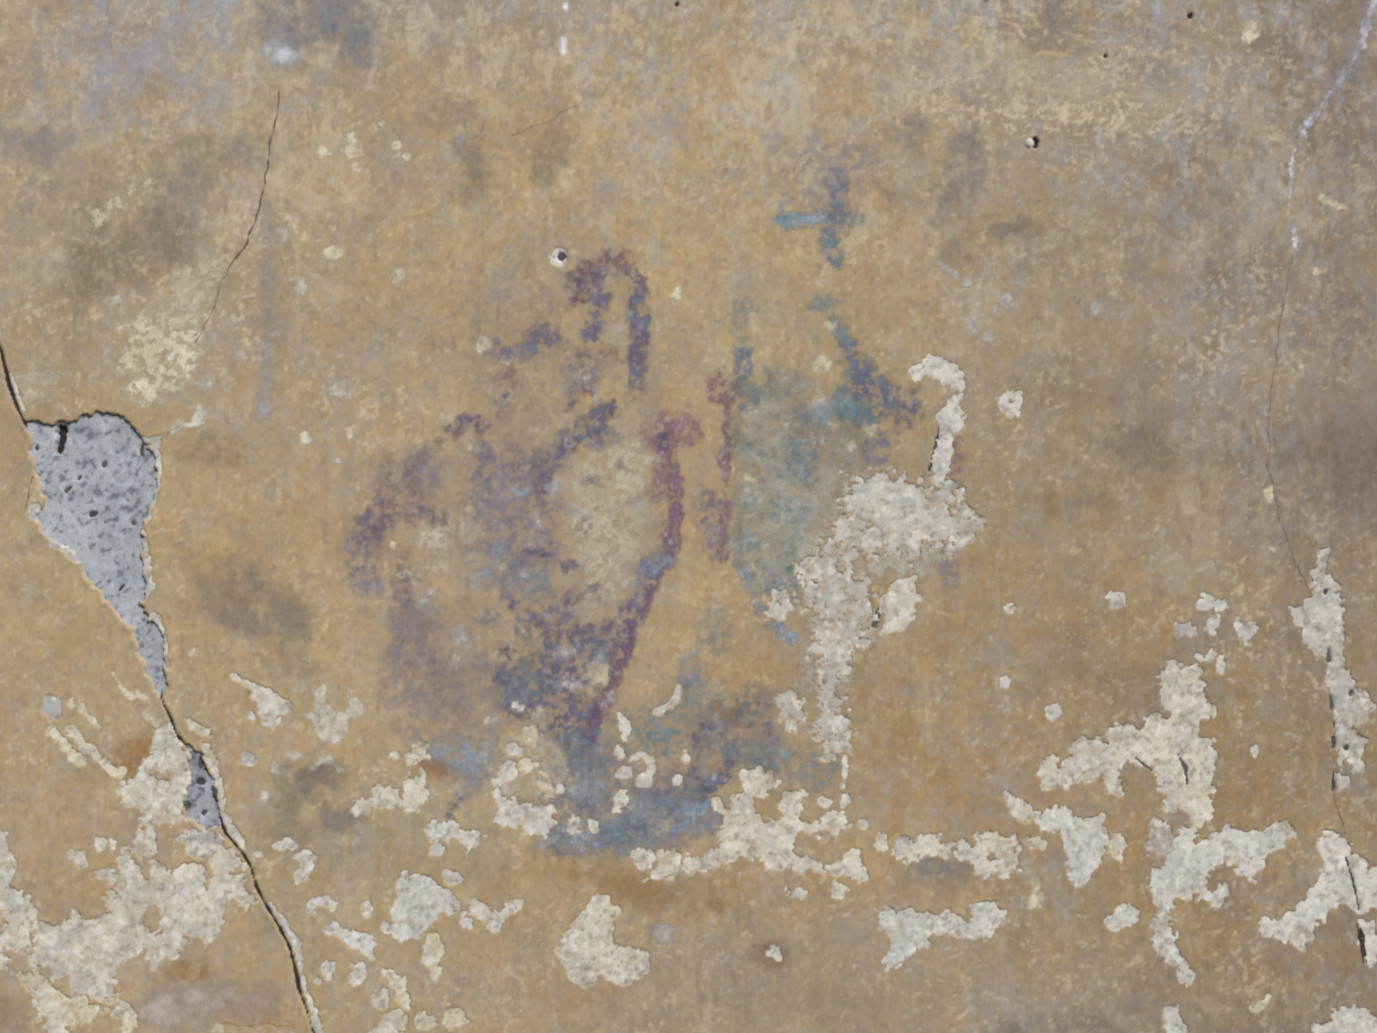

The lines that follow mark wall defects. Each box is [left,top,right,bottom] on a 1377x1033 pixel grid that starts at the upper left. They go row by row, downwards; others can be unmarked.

crack [0,331,28,427]
crack [195,91,280,342]
crack [1267,0,1377,589]
spalling [0,380,316,1033]
peeling [631,354,1297,987]
peeling [1288,548,1376,792]
crack [160,693,324,1033]
peeling [306,701,599,1033]
peeling [555,894,676,988]
peeling [1259,830,1377,967]
peeling [1312,1004,1377,1033]
crack [1356,923,1367,963]